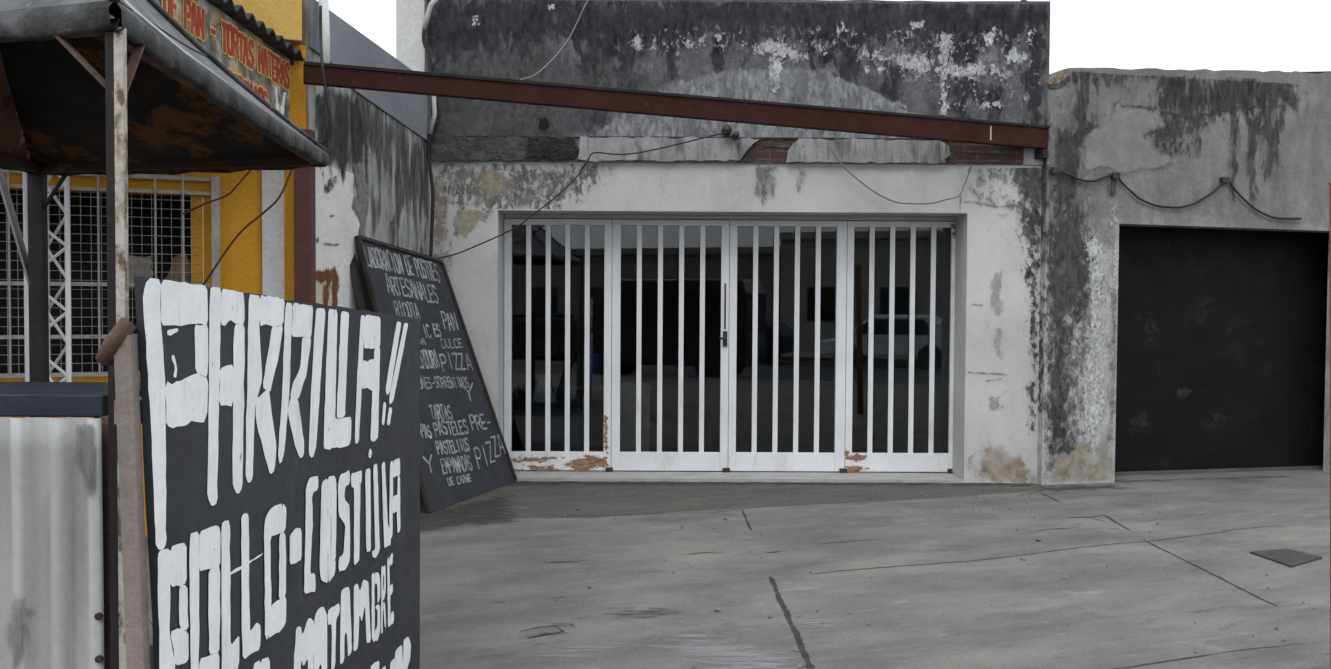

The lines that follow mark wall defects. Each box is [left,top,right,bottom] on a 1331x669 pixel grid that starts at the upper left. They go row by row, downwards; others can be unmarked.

leakage [316,87,610,272]
flaking render [736,139,799,163]
flaking render [940,141,1024,165]
peeling [453,209,489,237]
leakage [427,0,1300,483]
rust [511,415,609,472]